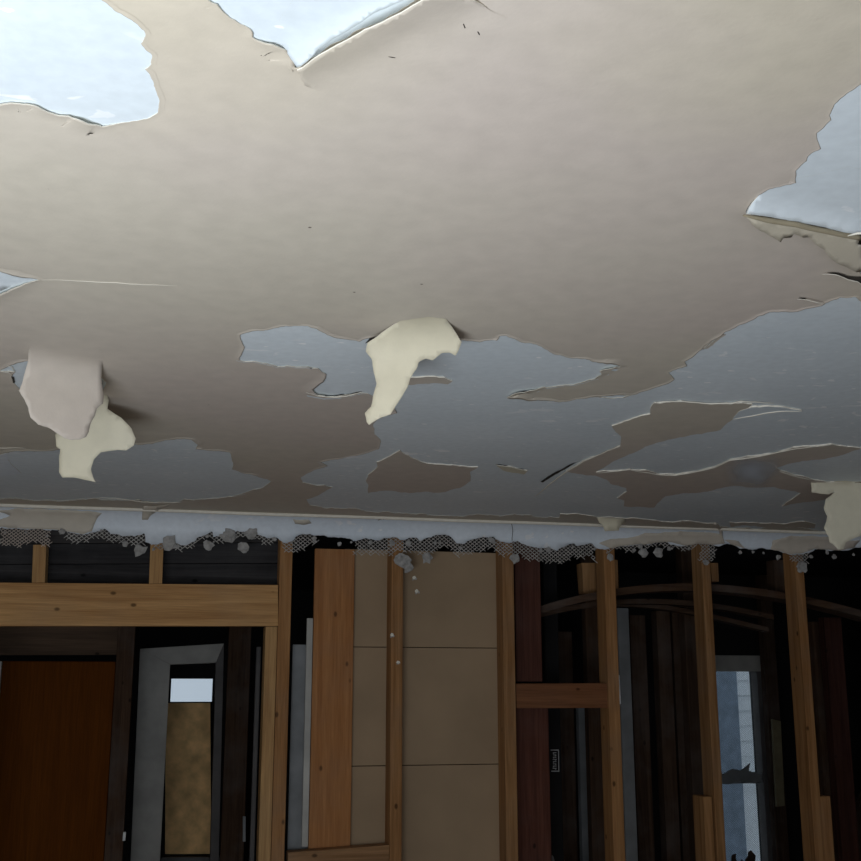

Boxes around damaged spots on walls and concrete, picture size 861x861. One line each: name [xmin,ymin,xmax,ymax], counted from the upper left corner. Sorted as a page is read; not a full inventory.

peeling [0,0,166,136]
peeling [188,0,506,103]
peeling [741,80,861,277]
peeling [0,268,47,307]
peeling [0,330,319,557]
peeling [234,295,861,573]